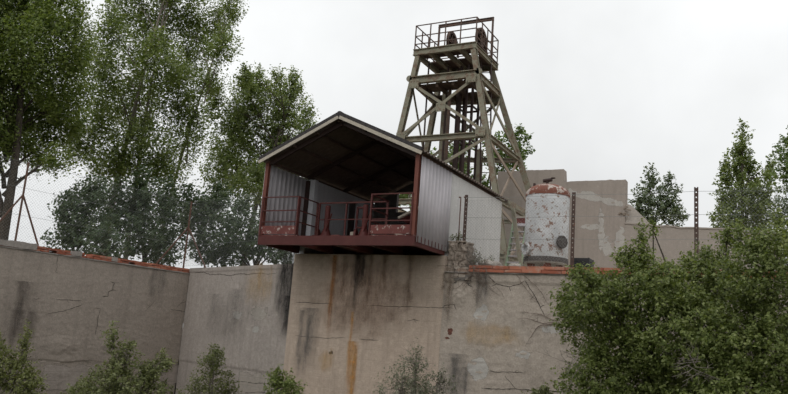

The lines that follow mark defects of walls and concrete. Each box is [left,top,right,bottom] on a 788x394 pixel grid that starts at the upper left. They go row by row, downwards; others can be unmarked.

peeling [569,188,631,256]